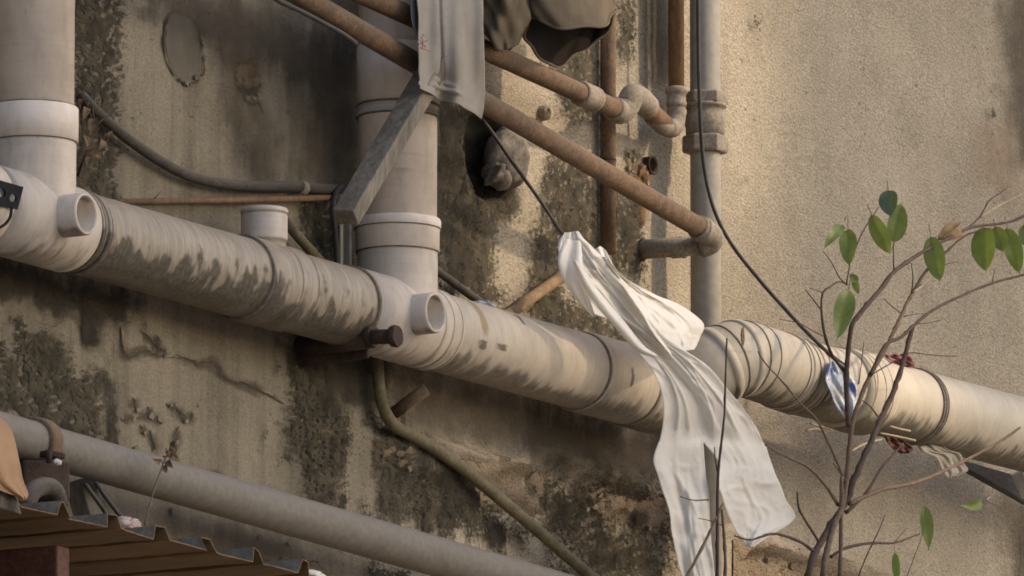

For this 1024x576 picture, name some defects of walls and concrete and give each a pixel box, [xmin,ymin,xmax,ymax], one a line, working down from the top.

water stain [74,0,129,199]
peeling [163,12,208,87]
water stain [0,315,121,444]
crack [38,320,286,404]
water stain [263,339,680,576]